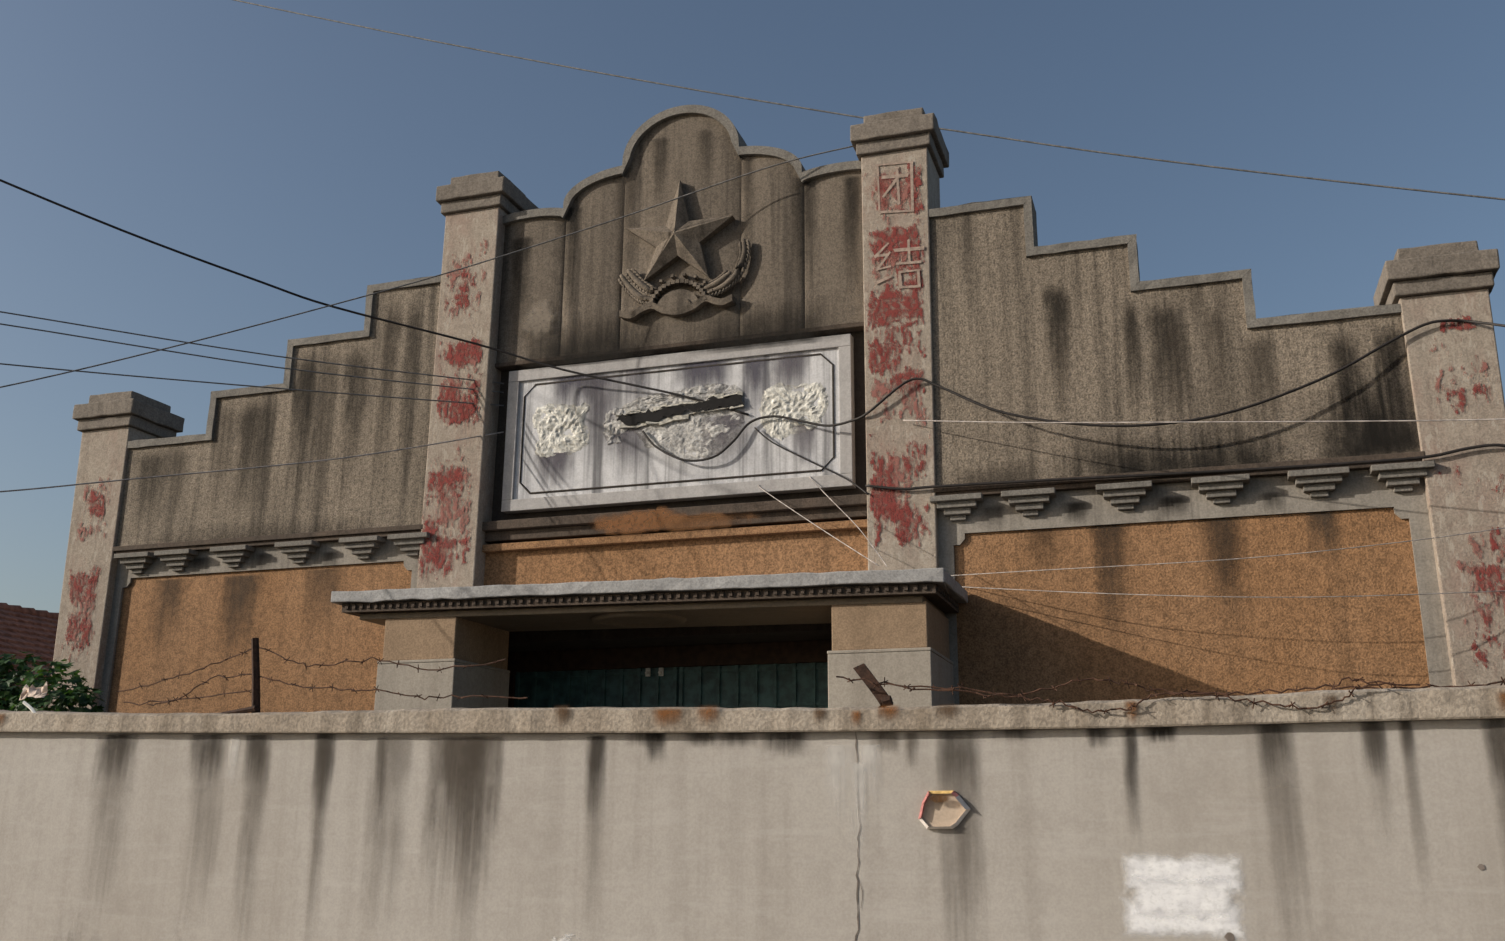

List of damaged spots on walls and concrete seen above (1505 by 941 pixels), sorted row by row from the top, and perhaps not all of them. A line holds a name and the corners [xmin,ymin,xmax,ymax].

peeling [444,240,488,319]
peeling [417,337,482,580]
spalling [532,382,829,464]
peeling [862,154,931,547]
water stain [1328,336,1415,457]
peeling [61,565,101,661]
peeling [1456,526,1505,669]
water stain [317,734,331,782]
water stain [439,738,485,829]
water stain [589,736,603,782]
water stain [1261,724,1282,747]
crack [855,732,863,941]